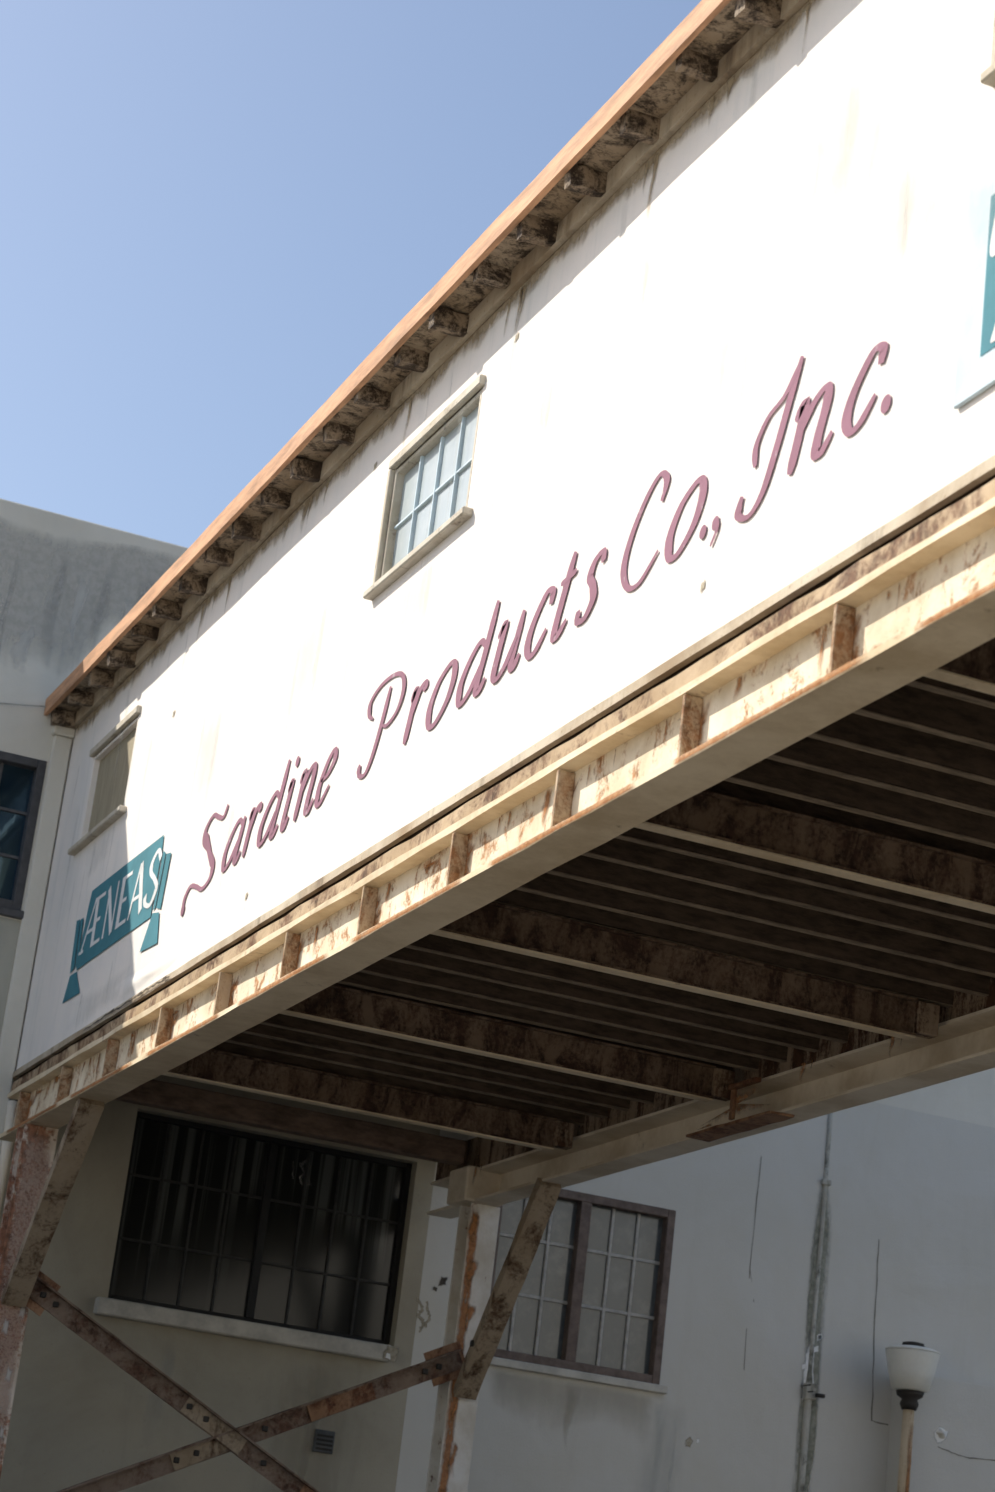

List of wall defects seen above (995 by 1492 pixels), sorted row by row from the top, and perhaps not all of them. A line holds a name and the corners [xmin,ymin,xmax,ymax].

leakage [644,154,659,201]
leakage [506,286,526,321]
rust [920,582,995,628]
rust [674,619,860,764]
rust [491,767,631,865]
rust [353,834,473,942]
rust [456,1211,478,1351]
rust [439,1379,458,1492]